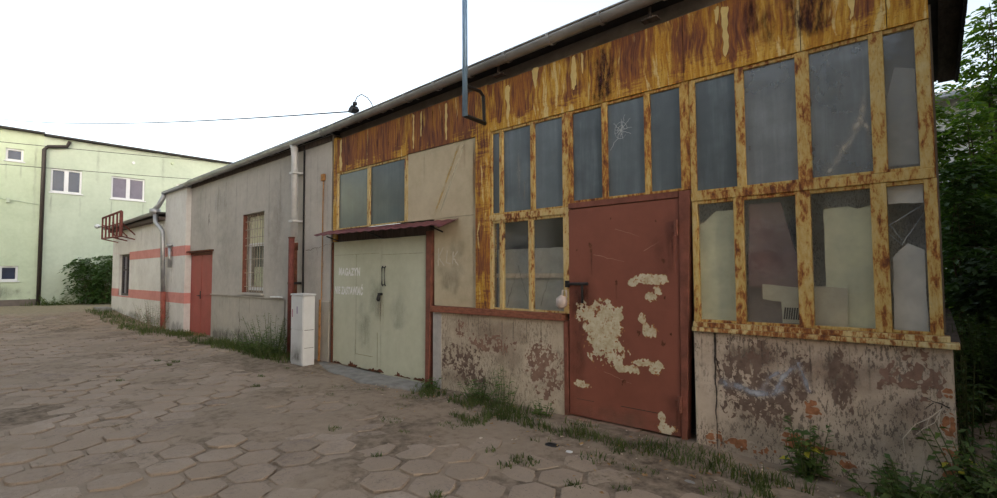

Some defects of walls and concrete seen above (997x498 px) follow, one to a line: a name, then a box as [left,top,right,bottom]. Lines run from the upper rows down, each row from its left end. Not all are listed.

corrosion [787,0,828,33]
corrosion [594,48,612,101]
peeling [628,273,669,303]
peeling [442,320,592,404]
peeling [574,297,665,376]
peeling [657,411,678,435]
peeling [705,337,867,472]
peeling [877,348,959,480]